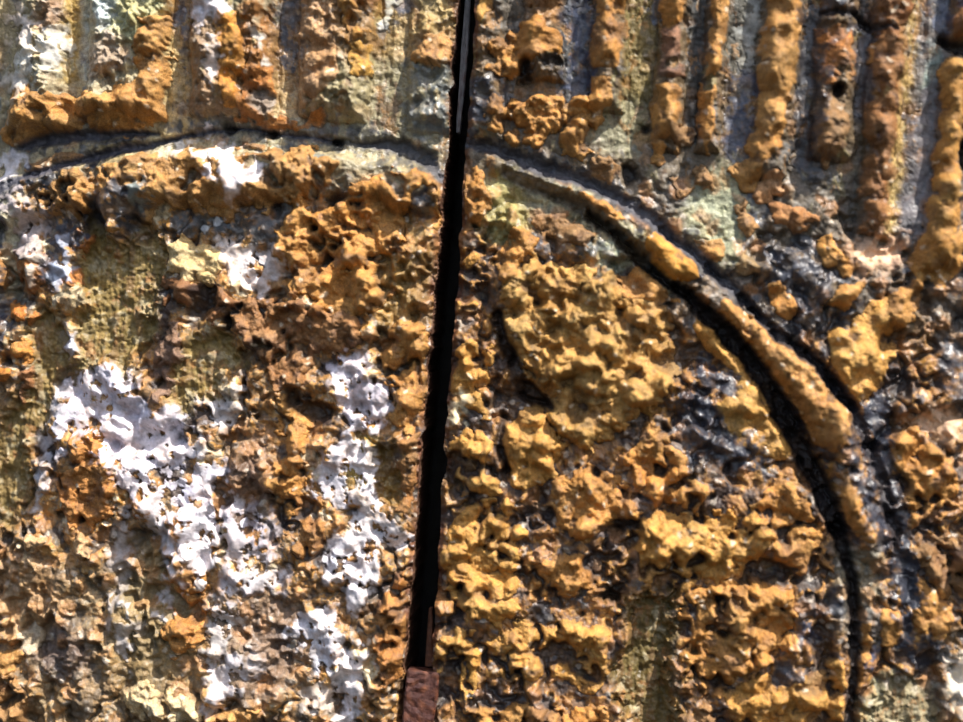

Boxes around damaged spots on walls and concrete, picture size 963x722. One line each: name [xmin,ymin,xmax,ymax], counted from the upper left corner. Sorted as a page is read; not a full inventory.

corrosion [0,621,47,722]
corrosion [0,15,179,147]
damp [25,320,305,722]
corrosion [119,679,262,722]
damp [0,0,454,370]
corrosion [24,140,443,571]
damp [280,347,415,722]
corrosion [479,0,631,185]
corrosion [433,165,850,722]
corrosion [726,0,820,277]
corrosion [816,57,963,401]
corrosion [860,421,963,698]